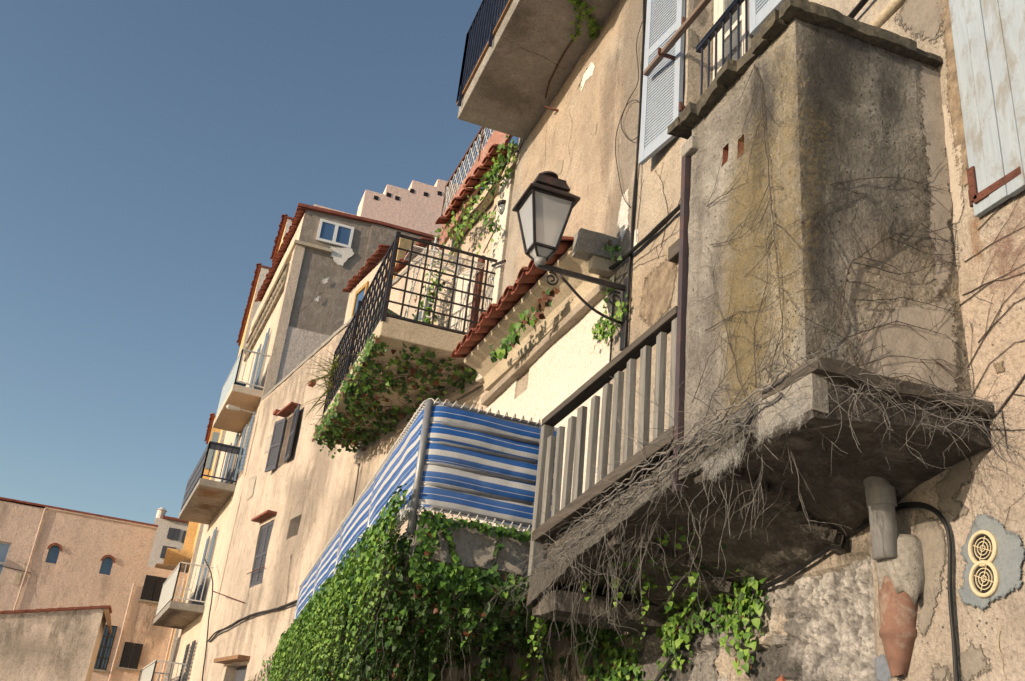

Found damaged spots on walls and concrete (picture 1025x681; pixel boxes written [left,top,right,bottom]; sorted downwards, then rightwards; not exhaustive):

flaking render [580,62,595,91]
flaking render [329,245,354,266]